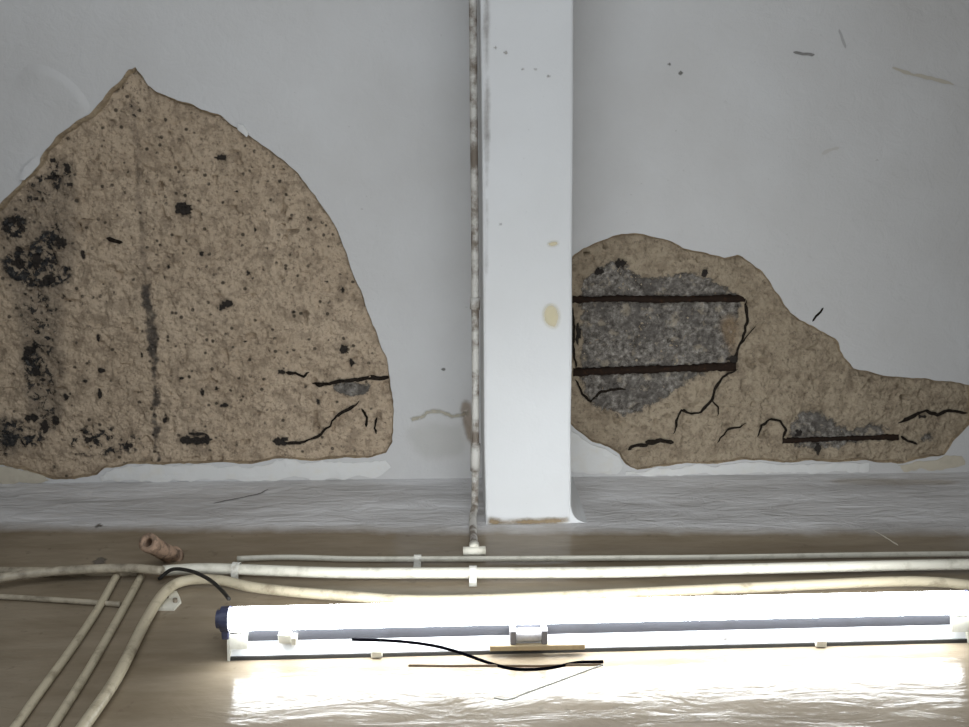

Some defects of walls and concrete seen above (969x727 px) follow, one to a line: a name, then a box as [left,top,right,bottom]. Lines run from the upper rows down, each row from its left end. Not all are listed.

spalling [0,67,394,482]
spalling [571,233,969,476]